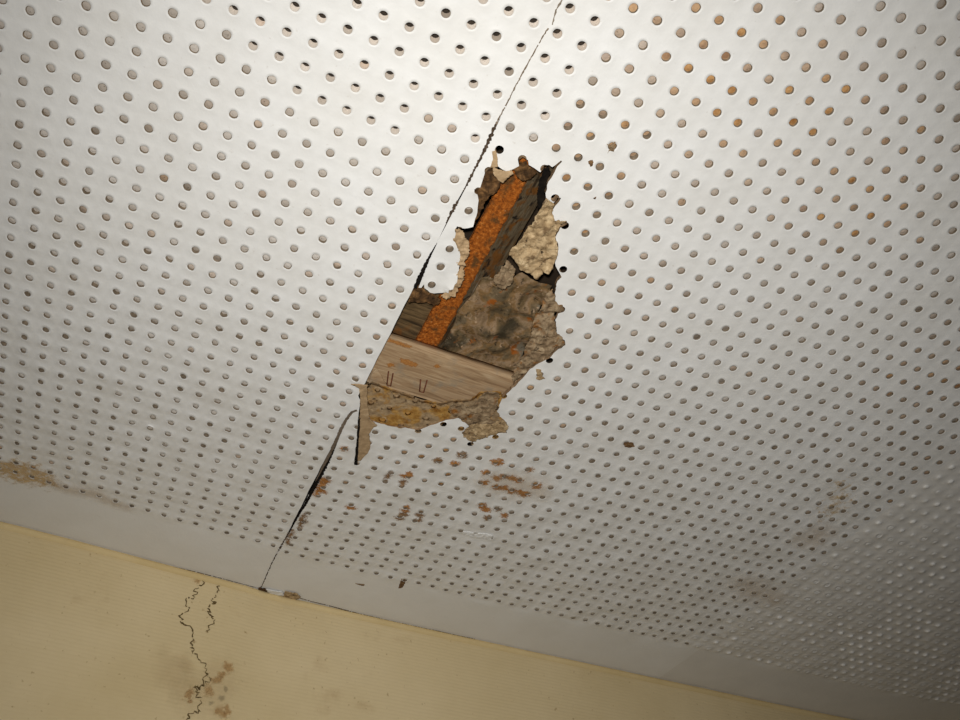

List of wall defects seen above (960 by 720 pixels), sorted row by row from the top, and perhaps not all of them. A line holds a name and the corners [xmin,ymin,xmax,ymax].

crack [414,0,562,289]
spalling [351,148,568,465]
crack [178,410,357,720]
corrosion [313,477,330,497]
corrosion [478,503,508,521]
corrosion [481,458,542,497]